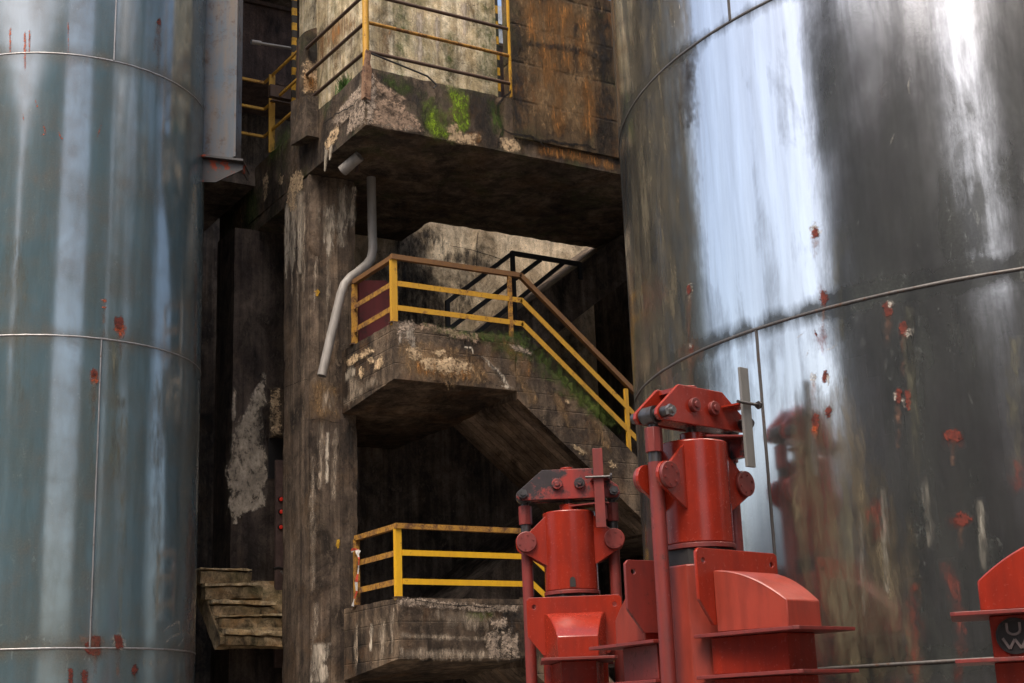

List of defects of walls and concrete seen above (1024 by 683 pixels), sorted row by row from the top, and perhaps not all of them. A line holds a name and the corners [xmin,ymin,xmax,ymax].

spalling [324,73,423,170]
rust [101,299,126,337]
spalling [344,348,383,400]
spalling [397,320,485,384]
rust [894,388,911,411]
flaking render [227,375,282,524]
rust [943,429,963,442]
rust [85,634,126,657]